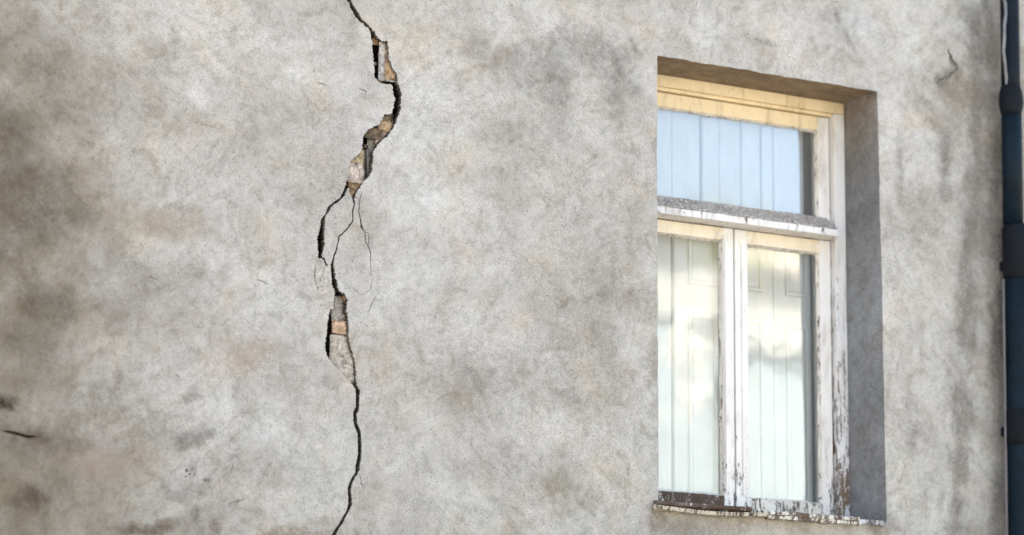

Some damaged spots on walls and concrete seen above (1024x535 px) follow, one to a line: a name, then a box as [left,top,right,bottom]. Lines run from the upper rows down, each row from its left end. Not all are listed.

crack [314,0,402,535]